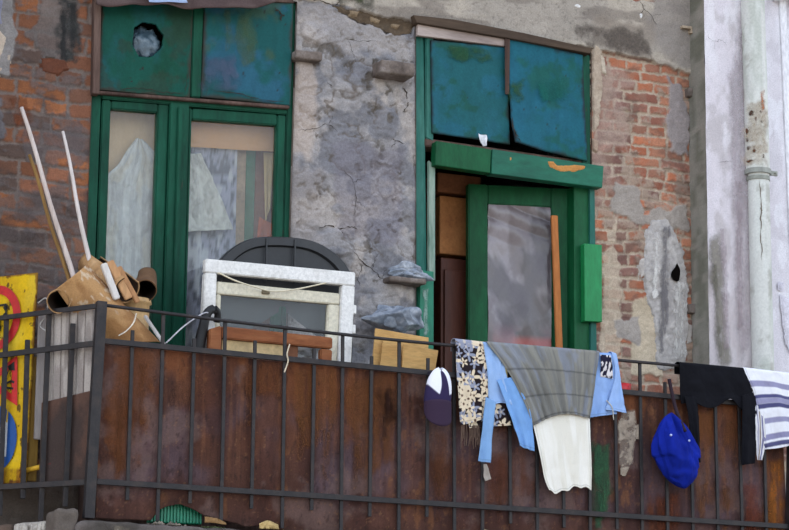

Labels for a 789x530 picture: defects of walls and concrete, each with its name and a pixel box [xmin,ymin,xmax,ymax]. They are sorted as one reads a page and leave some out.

peeling [0,0,11,76]
spalling [39,56,70,77]
peeling [590,46,606,153]
peeling [637,219,692,371]
corrosion [95,344,786,530]